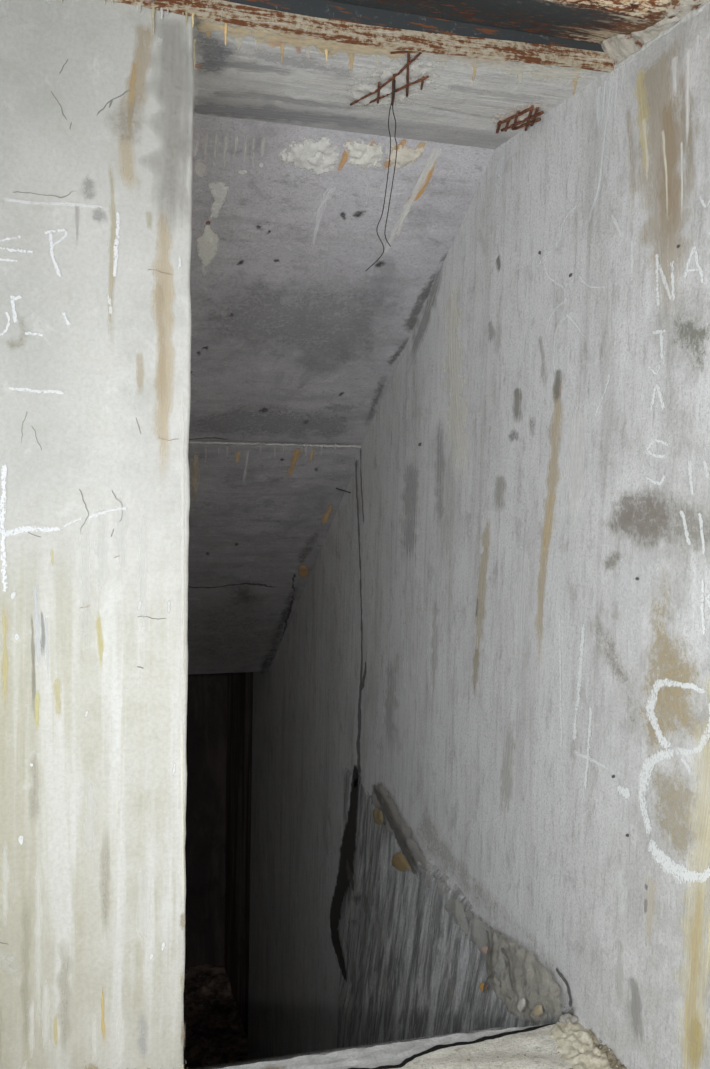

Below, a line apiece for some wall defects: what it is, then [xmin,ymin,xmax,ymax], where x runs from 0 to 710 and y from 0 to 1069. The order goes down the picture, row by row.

rust [120,29,150,134]
water stain [194,135,265,273]
water stain [195,93,363,126]
water stain [280,137,440,247]
rust [156,218,173,443]
rust [538,371,560,630]
crack [330,450,417,981]
spalling [371,784,574,1023]
crack [483,930,514,993]
rust [684,728,710,1069]